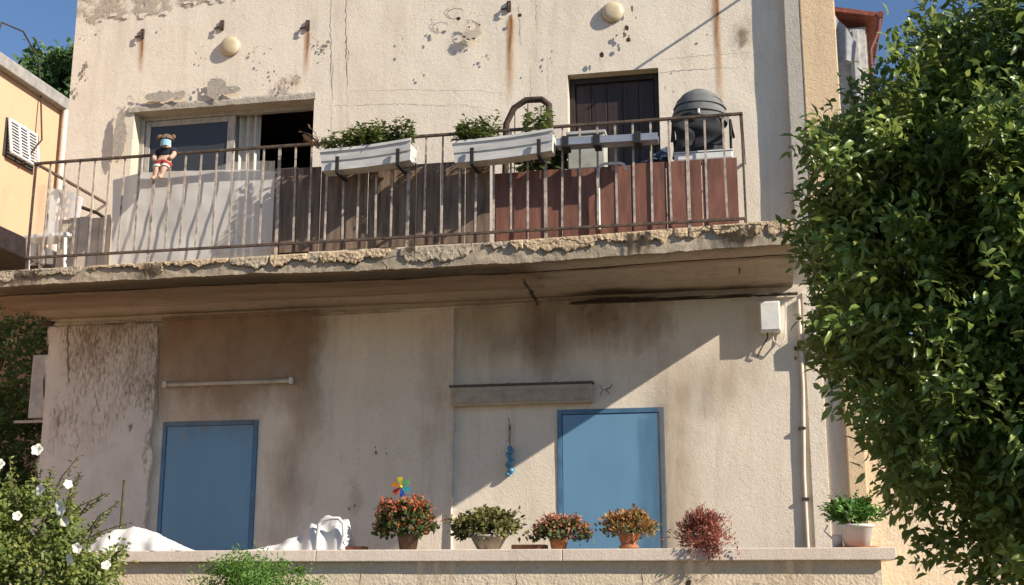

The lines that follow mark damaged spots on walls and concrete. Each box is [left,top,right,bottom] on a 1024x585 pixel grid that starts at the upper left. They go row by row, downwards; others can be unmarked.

peeling [78,0,233,37]
peeling [112,77,241,163]
spalling [0,219,793,283]
leakage [0,232,798,410]
crack [522,279,556,350]